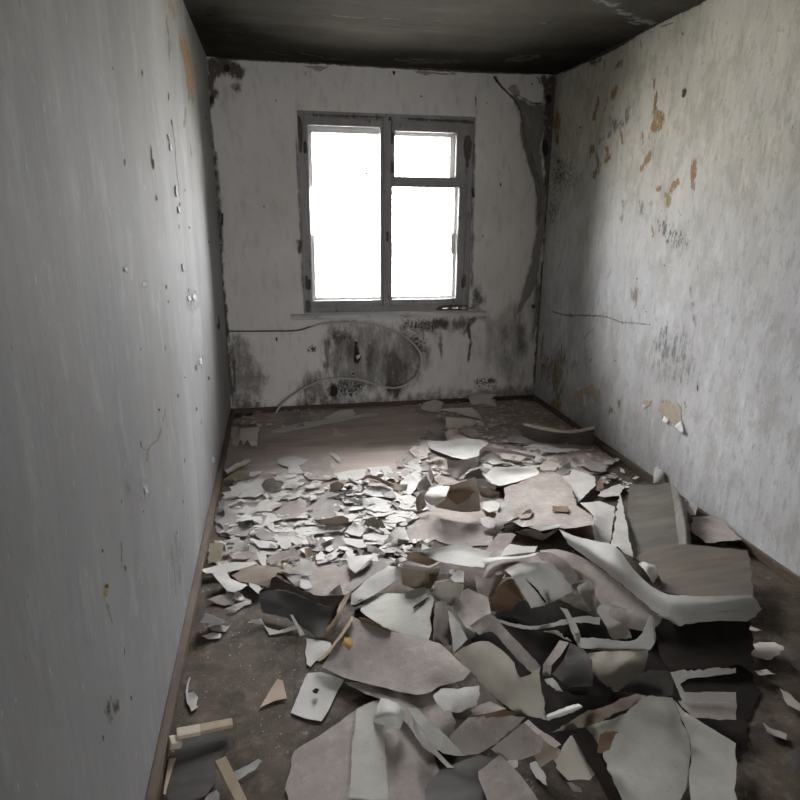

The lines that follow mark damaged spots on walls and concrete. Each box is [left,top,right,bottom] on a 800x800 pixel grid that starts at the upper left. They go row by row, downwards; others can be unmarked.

water stain [207,57,245,108]
peeling [641,79,665,140]
peeling [656,179,680,207]
water stain [211,126,261,408]
water stain [297,207,484,406]
crack [553,311,650,336]
peeling [642,400,686,433]